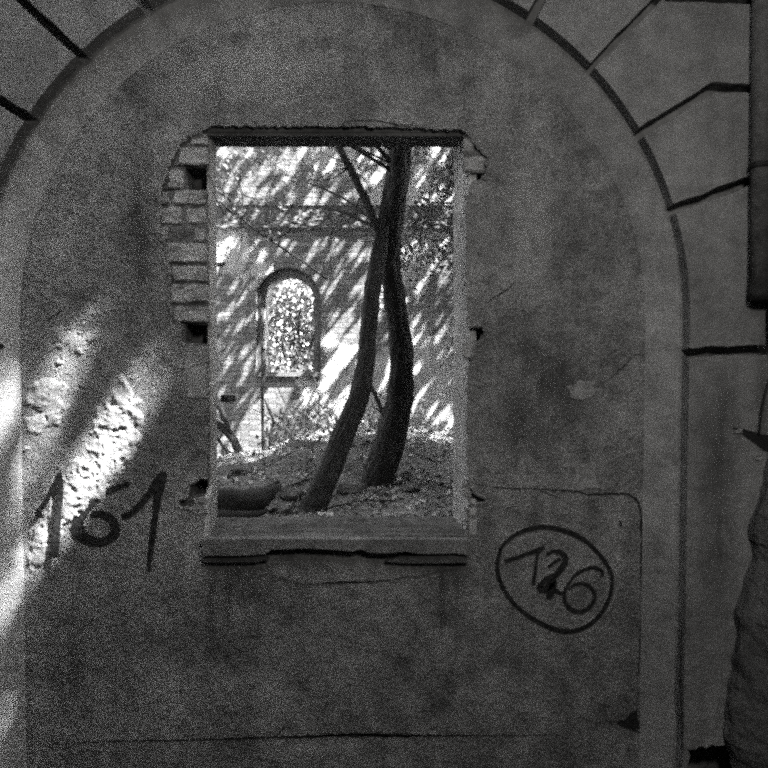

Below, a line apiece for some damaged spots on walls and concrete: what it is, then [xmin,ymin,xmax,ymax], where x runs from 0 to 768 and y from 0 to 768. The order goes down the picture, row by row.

flaking render [103,128,211,422]
flaking render [23,320,96,436]
flaking render [26,374,144,574]
flaking render [173,478,207,517]